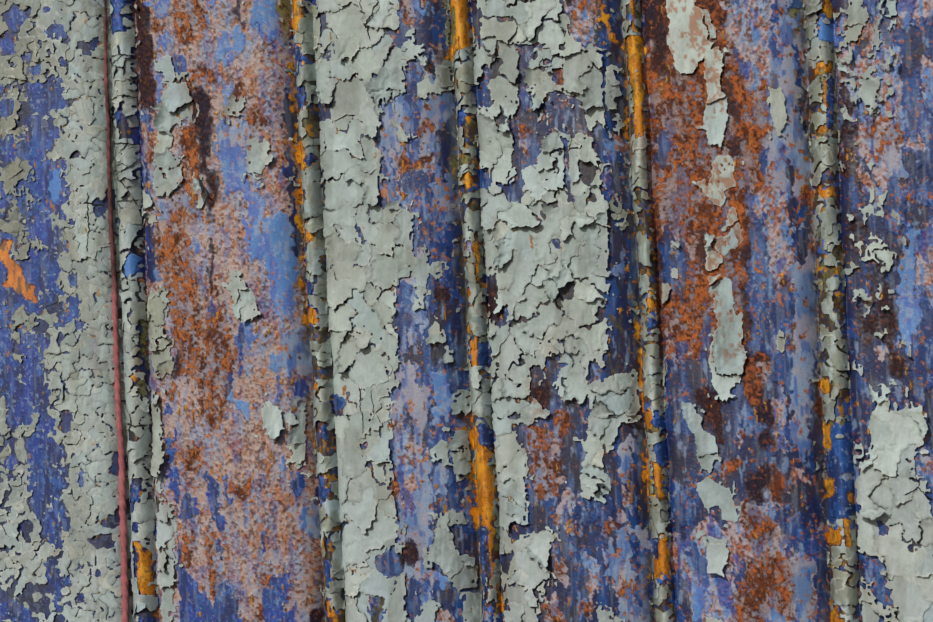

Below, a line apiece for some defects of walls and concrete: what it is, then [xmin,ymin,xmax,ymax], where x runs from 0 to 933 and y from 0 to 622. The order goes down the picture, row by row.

corrosion [136,0,207,110]
peeling [215,95,247,128]
corrosion [837,100,904,161]
corrosion [153,65,240,427]
corrosion [641,0,775,448]
peeling [0,0,221,622]
peeling [222,269,278,345]
peeling [764,0,933,622]
corrosion [863,272,903,377]
corrosion [739,462,785,544]
corrosion [181,528,215,597]
corrosion [736,551,795,622]